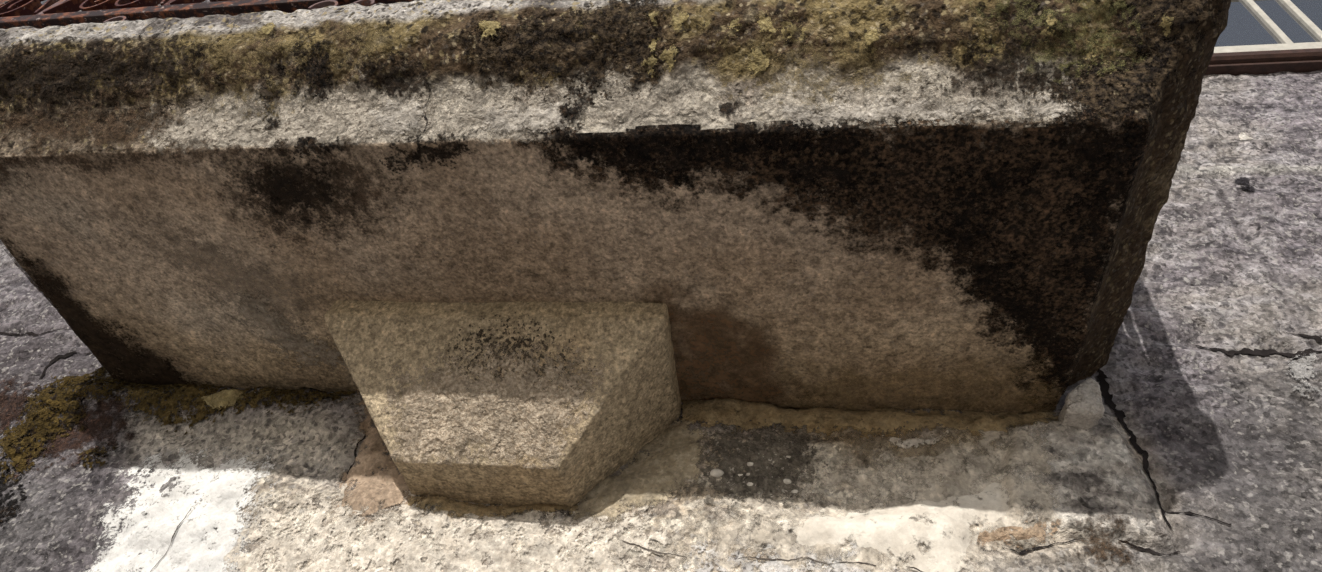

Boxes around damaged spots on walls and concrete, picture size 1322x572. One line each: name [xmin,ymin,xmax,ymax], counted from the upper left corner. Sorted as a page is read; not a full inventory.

damp [0,32,416,255]
damp [355,49,432,105]
damp [446,0,1227,408]
damp [0,212,209,387]
crack [1196,332,1322,359]
crack [979,538,1086,555]
crack [1097,369,1232,555]